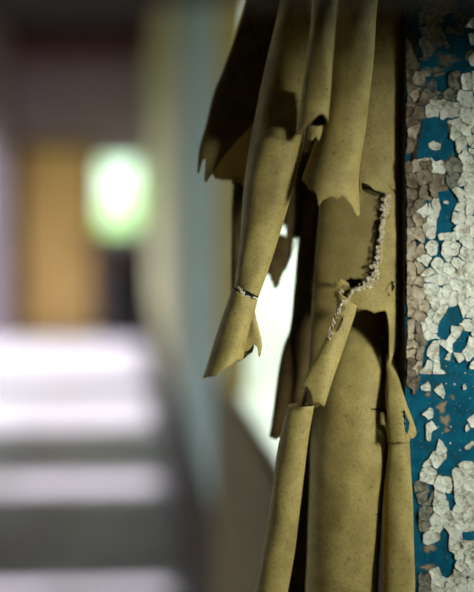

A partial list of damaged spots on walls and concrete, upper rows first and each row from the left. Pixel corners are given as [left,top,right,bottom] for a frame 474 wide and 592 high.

peeling [404,1,474,399]
crack [238,288,258,298]
peeling [413,408,474,592]